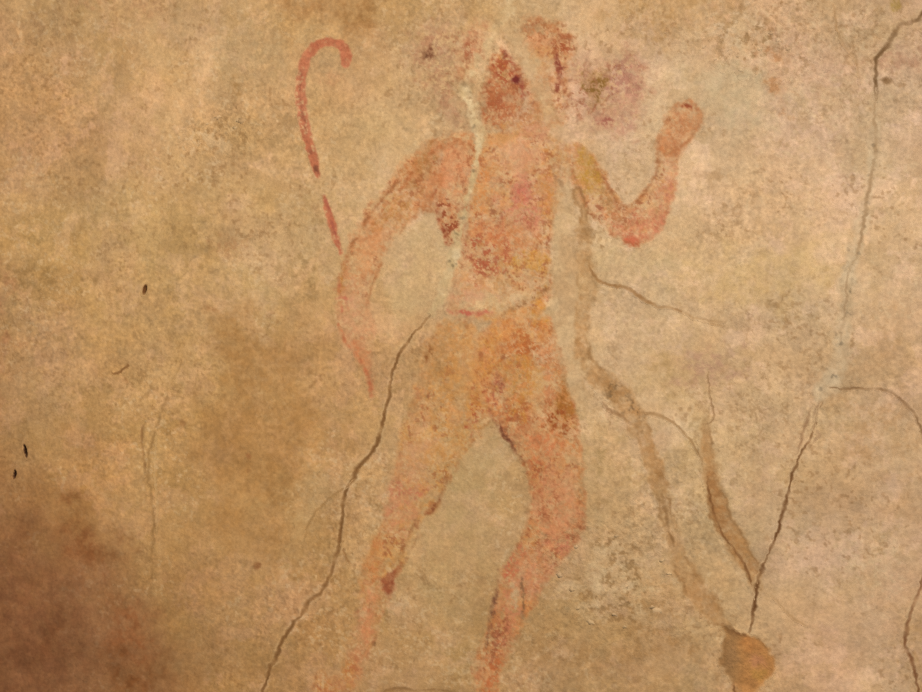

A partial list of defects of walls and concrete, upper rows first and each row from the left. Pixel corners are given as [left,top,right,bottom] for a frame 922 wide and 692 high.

crack [258,0,922,692]